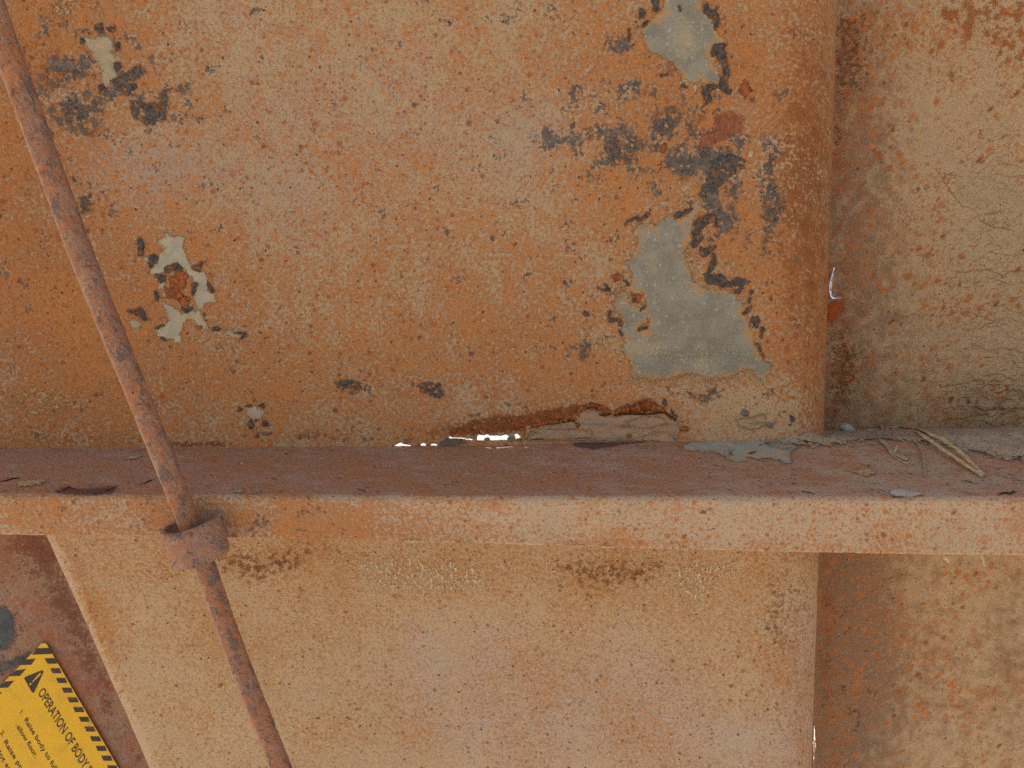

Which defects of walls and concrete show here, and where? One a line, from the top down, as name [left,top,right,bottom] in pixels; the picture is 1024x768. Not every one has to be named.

peeling [80,23,122,91]
peeling [627,0,751,106]
rust [833,13,869,155]
rust [937,0,1024,63]
peeling [126,233,247,347]
peeling [597,191,771,385]
rust [827,301,859,412]
peeling [237,402,269,430]
rust [448,405,581,436]
spalling [507,398,797,464]